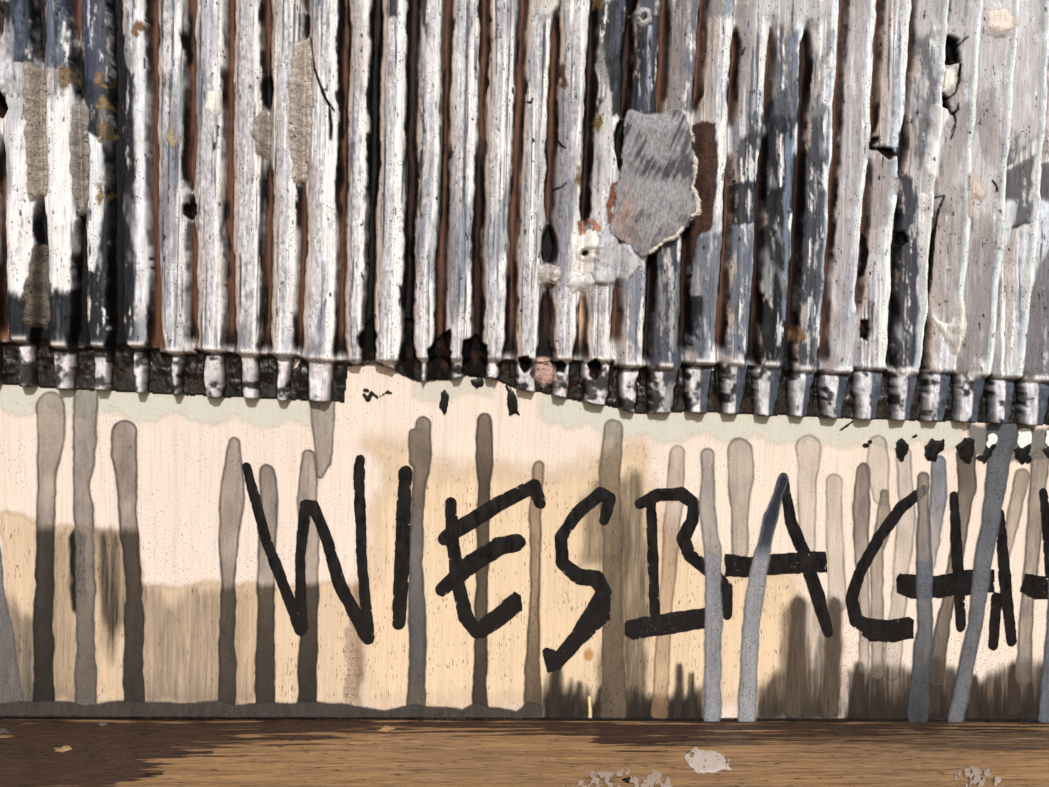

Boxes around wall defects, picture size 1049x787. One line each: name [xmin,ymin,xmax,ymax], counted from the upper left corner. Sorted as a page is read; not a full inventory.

corrosion [132,21,145,37]
corrosion [58,67,79,88]
corrosion [558,65,567,88]
corrosion [95,72,116,142]
corrosion [592,114,602,132]
peeling [683,121,718,264]
damp [0,474,1049,787]